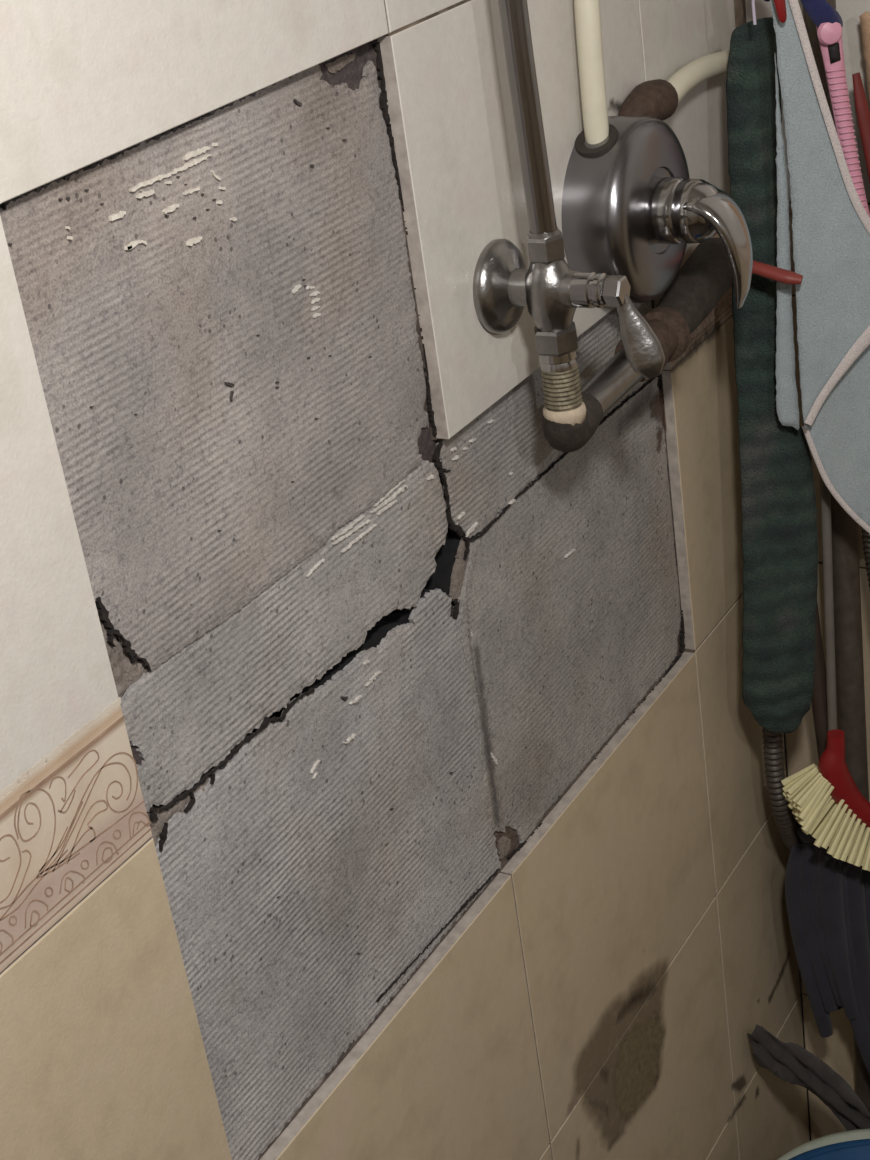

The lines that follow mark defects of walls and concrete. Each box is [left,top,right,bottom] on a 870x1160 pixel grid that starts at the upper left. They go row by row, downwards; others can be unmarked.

crack [341,39,408,235]
crack [599,372,664,426]
crack [95,288,568,1002]
spalling [0,43,681,1160]
crack [595,610,686,760]
damp [577,967,665,1143]